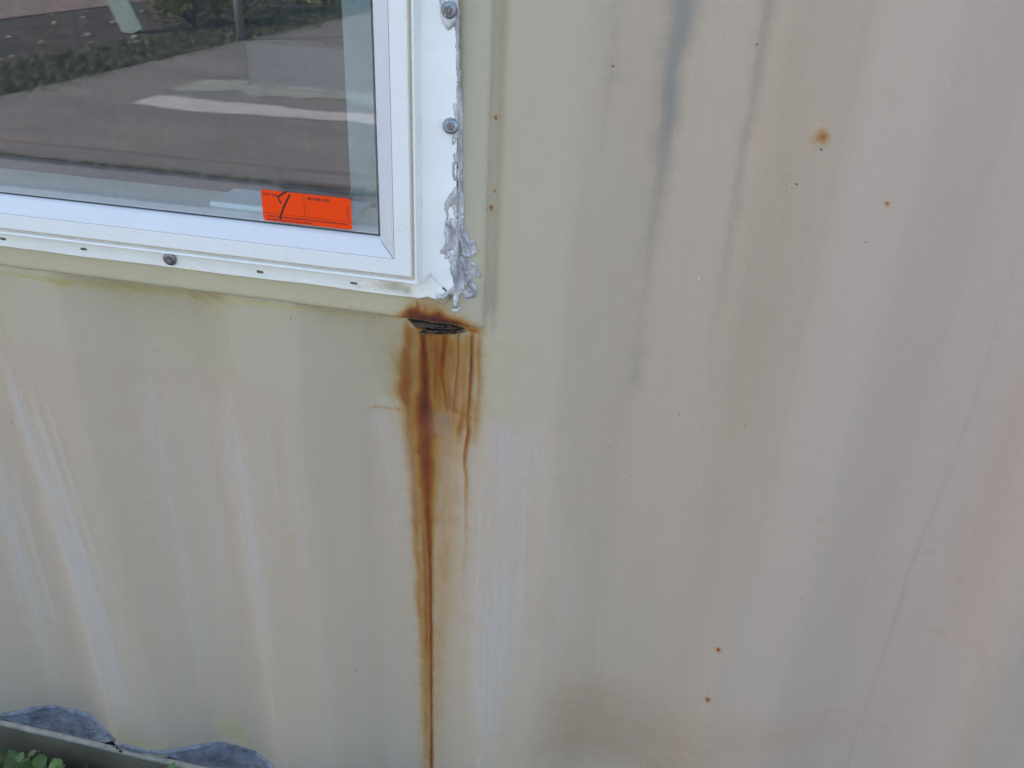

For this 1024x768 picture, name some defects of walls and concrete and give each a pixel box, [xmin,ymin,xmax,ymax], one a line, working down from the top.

leakage [654,0,697,202]
rust [816,131,829,144]
rust [396,301,482,768]